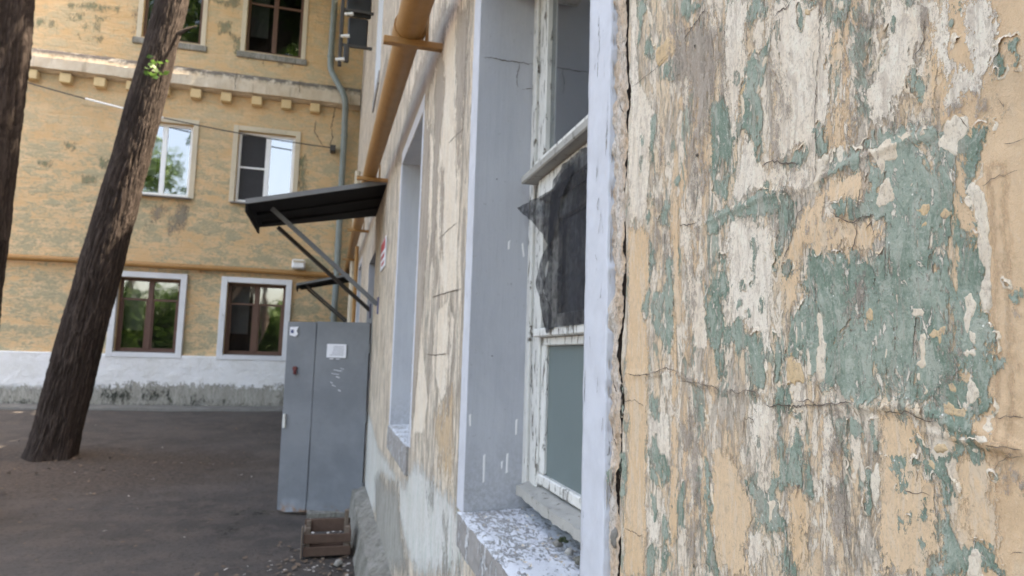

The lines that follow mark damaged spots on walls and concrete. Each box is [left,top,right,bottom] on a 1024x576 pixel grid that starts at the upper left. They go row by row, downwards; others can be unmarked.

water stain [101,386,172,404]
peeling [413,0,467,435]
crack [619,0,666,178]
spalling [606,0,696,576]
crack [602,223,857,576]
peeling [641,0,1023,576]